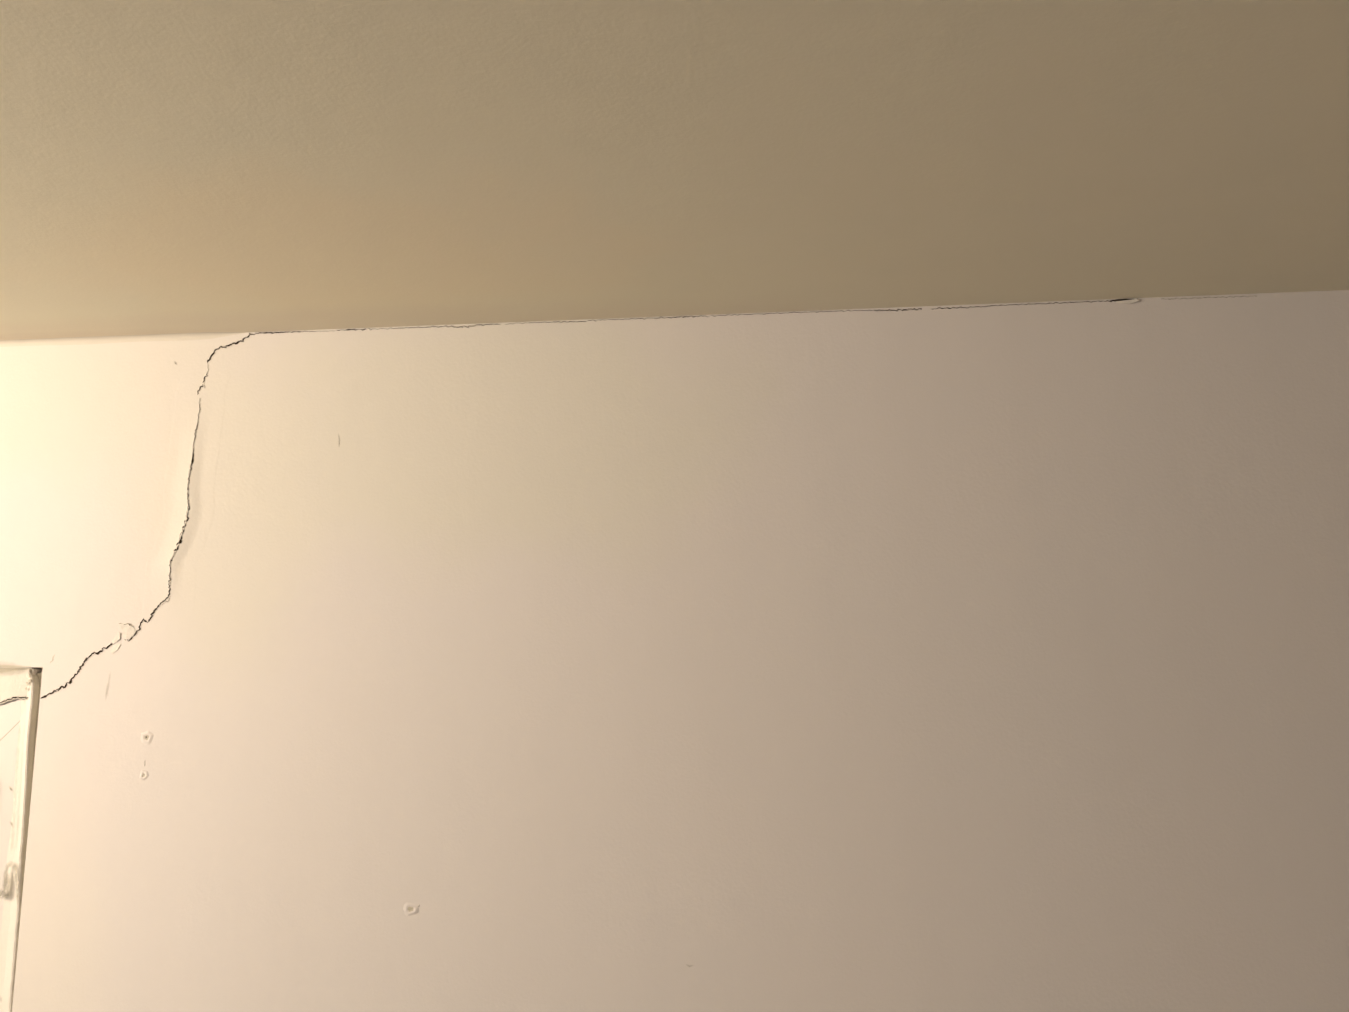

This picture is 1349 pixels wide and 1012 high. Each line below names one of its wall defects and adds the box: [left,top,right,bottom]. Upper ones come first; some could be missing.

crack [0,295,1257,704]